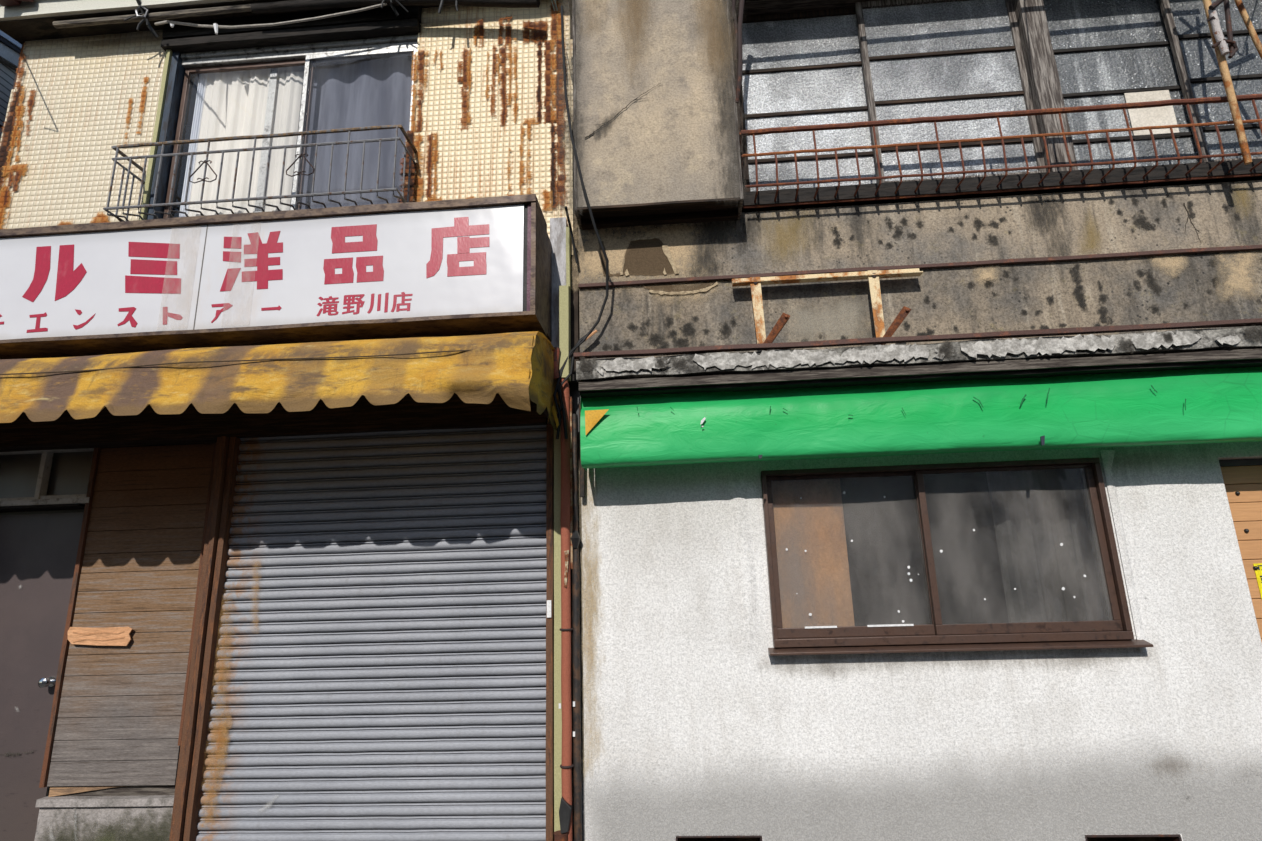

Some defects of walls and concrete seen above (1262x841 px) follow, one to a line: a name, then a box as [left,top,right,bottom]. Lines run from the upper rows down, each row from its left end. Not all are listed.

rust [0,44,35,229]
rust [398,0,566,211]
crack [585,83,661,138]
mould [878,217,923,249]
mould [949,215,1011,245]
mould [1109,193,1173,233]
flaking render [599,236,718,301]
leakage [1069,264,1113,327]
leakage [1127,269,1175,342]
peeling [693,343,945,370]
peeling [960,334,1116,358]
peeling [1131,330,1241,350]